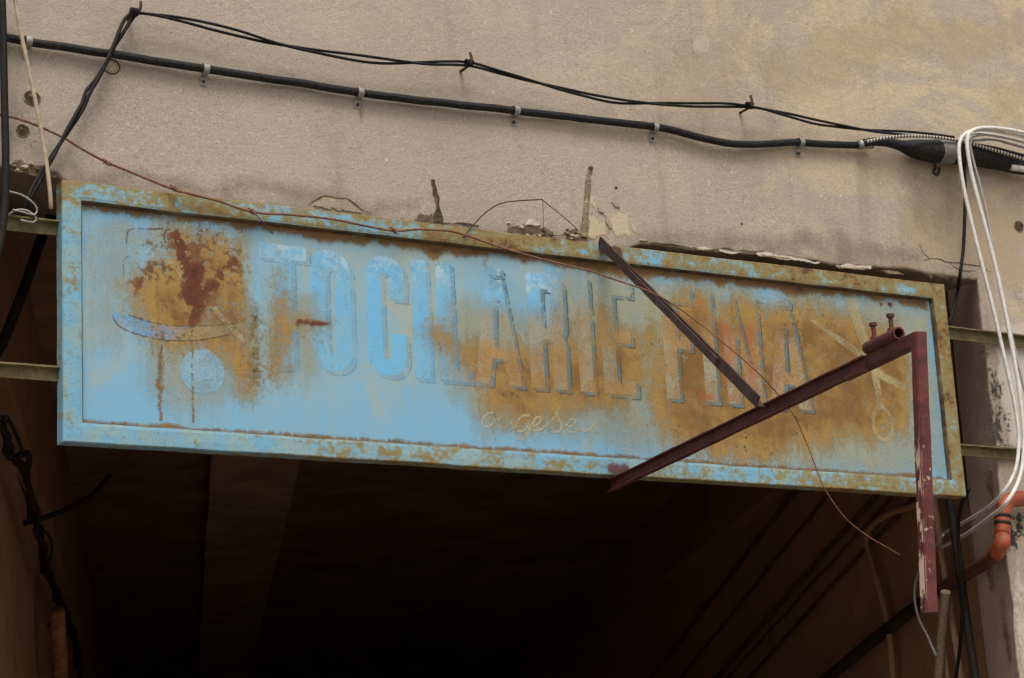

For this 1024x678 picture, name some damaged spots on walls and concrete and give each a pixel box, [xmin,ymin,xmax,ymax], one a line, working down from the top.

peeling [415,213,434,224]
peeling [507,195,648,242]
peeling [756,252,820,264]
peeling [835,263,905,275]
damp [982,346,1011,447]